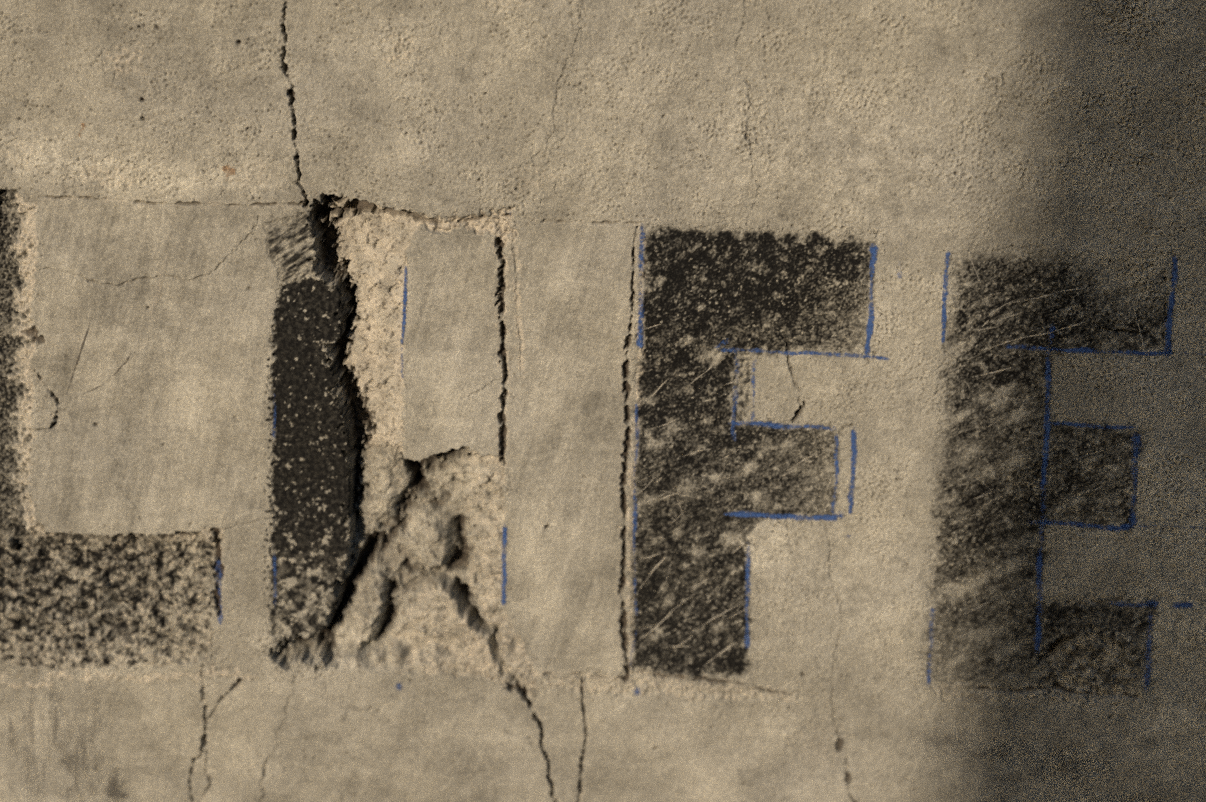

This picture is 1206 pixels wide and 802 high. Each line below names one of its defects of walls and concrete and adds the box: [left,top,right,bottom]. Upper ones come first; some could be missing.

peeling [0,138,49,177]
peeling [60,155,159,196]
crack [281,0,309,211]
spalling [0,193,860,784]
crack [781,331,856,802]
crack [189,670,243,802]
crack [260,676,298,802]
crack [505,672,589,802]